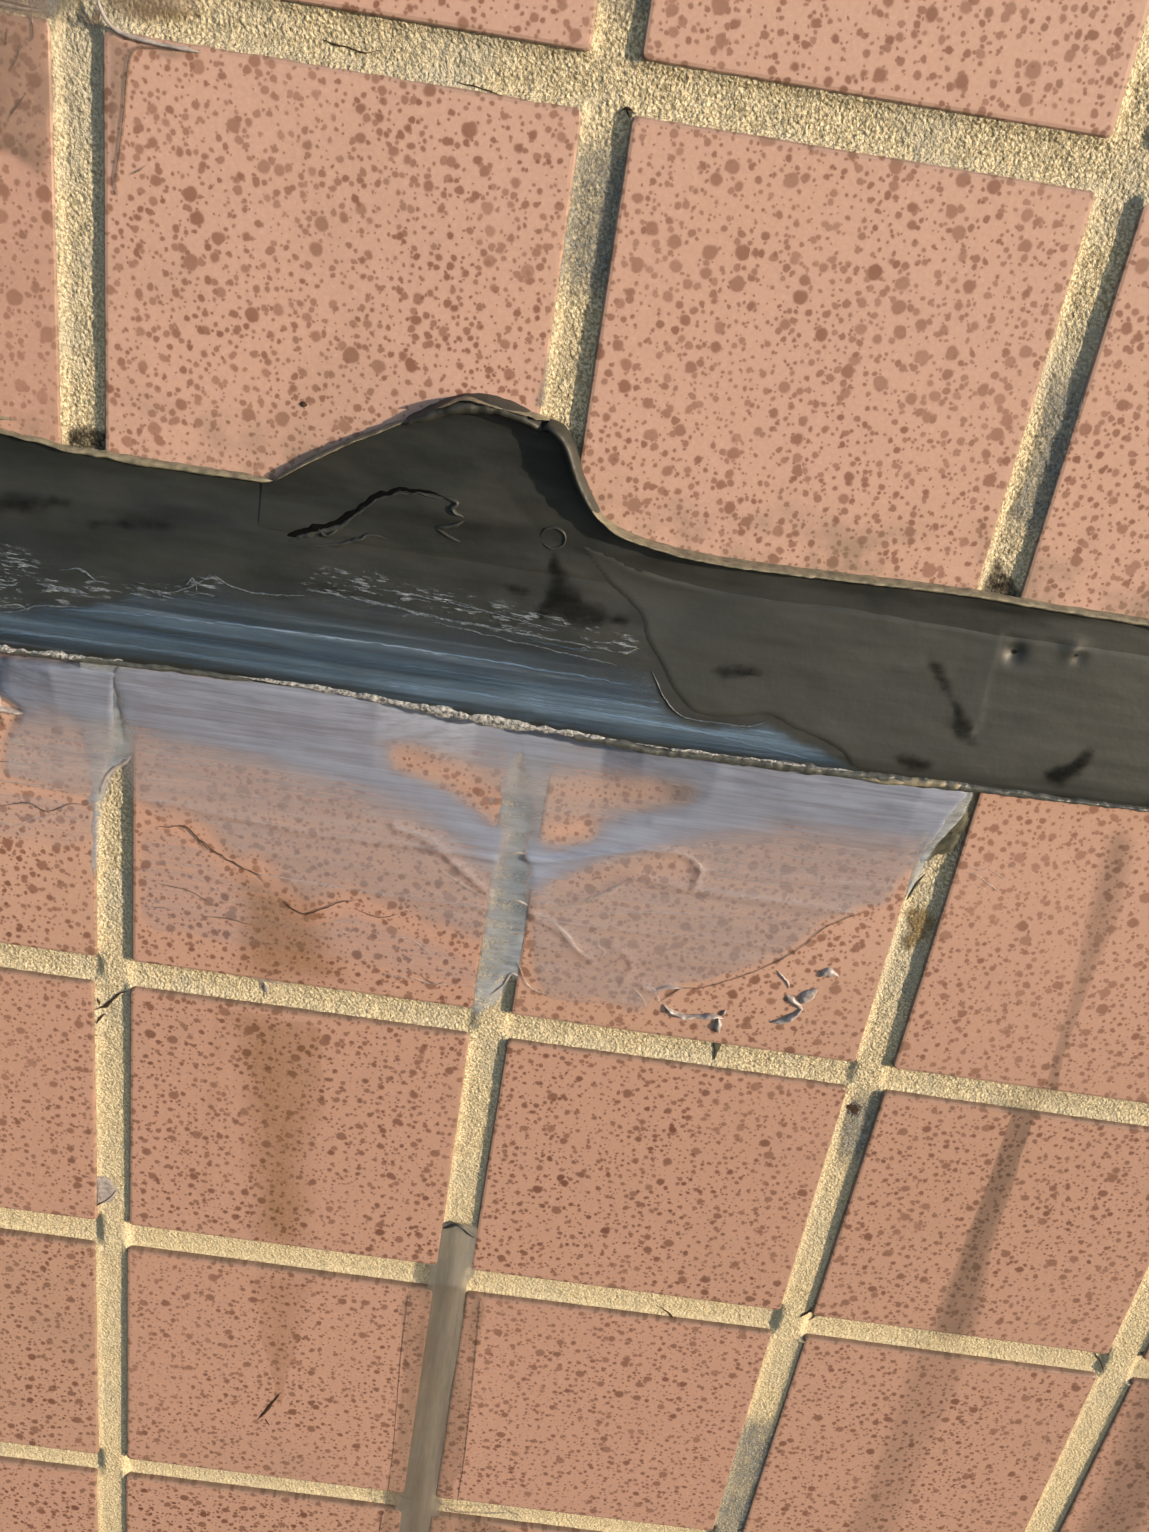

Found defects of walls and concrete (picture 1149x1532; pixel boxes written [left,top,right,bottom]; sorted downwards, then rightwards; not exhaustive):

peeling [664,1005,726,1033]
peeling [769,968,839,1025]